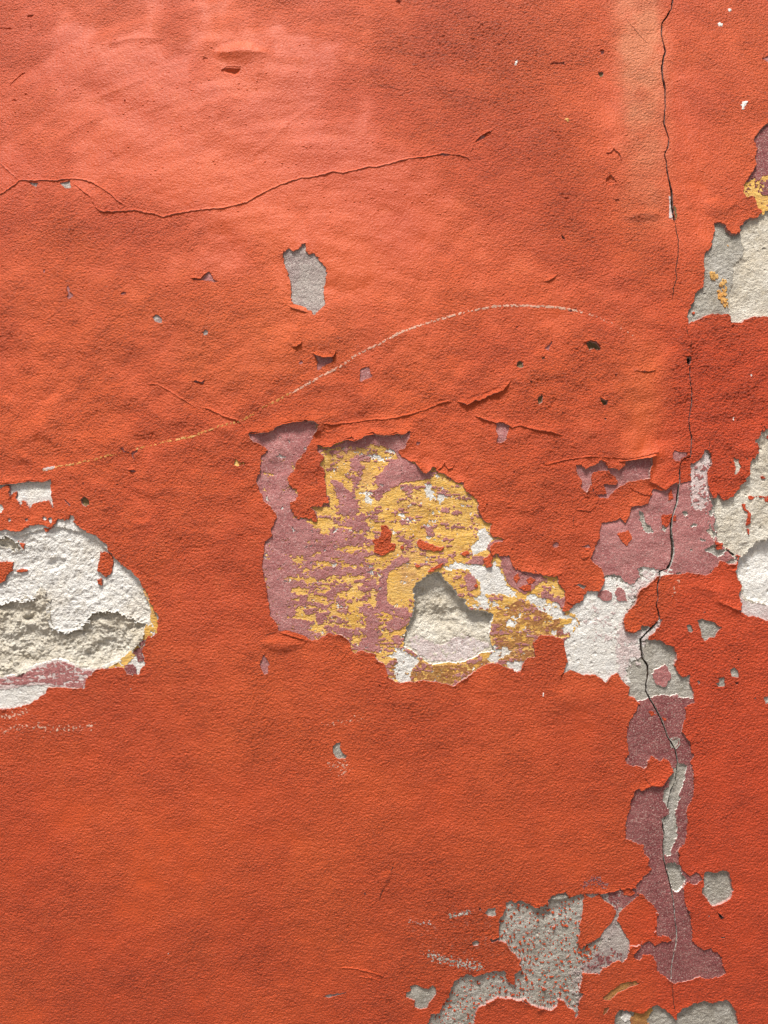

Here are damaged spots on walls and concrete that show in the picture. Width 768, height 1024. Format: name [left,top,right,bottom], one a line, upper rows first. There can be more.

peeling [283,245,327,315]
crack [661,51,679,298]
peeling [687,124,768,323]
spalling [0,480,159,709]
peeling [250,353,768,1024]
crack [639,435,710,894]